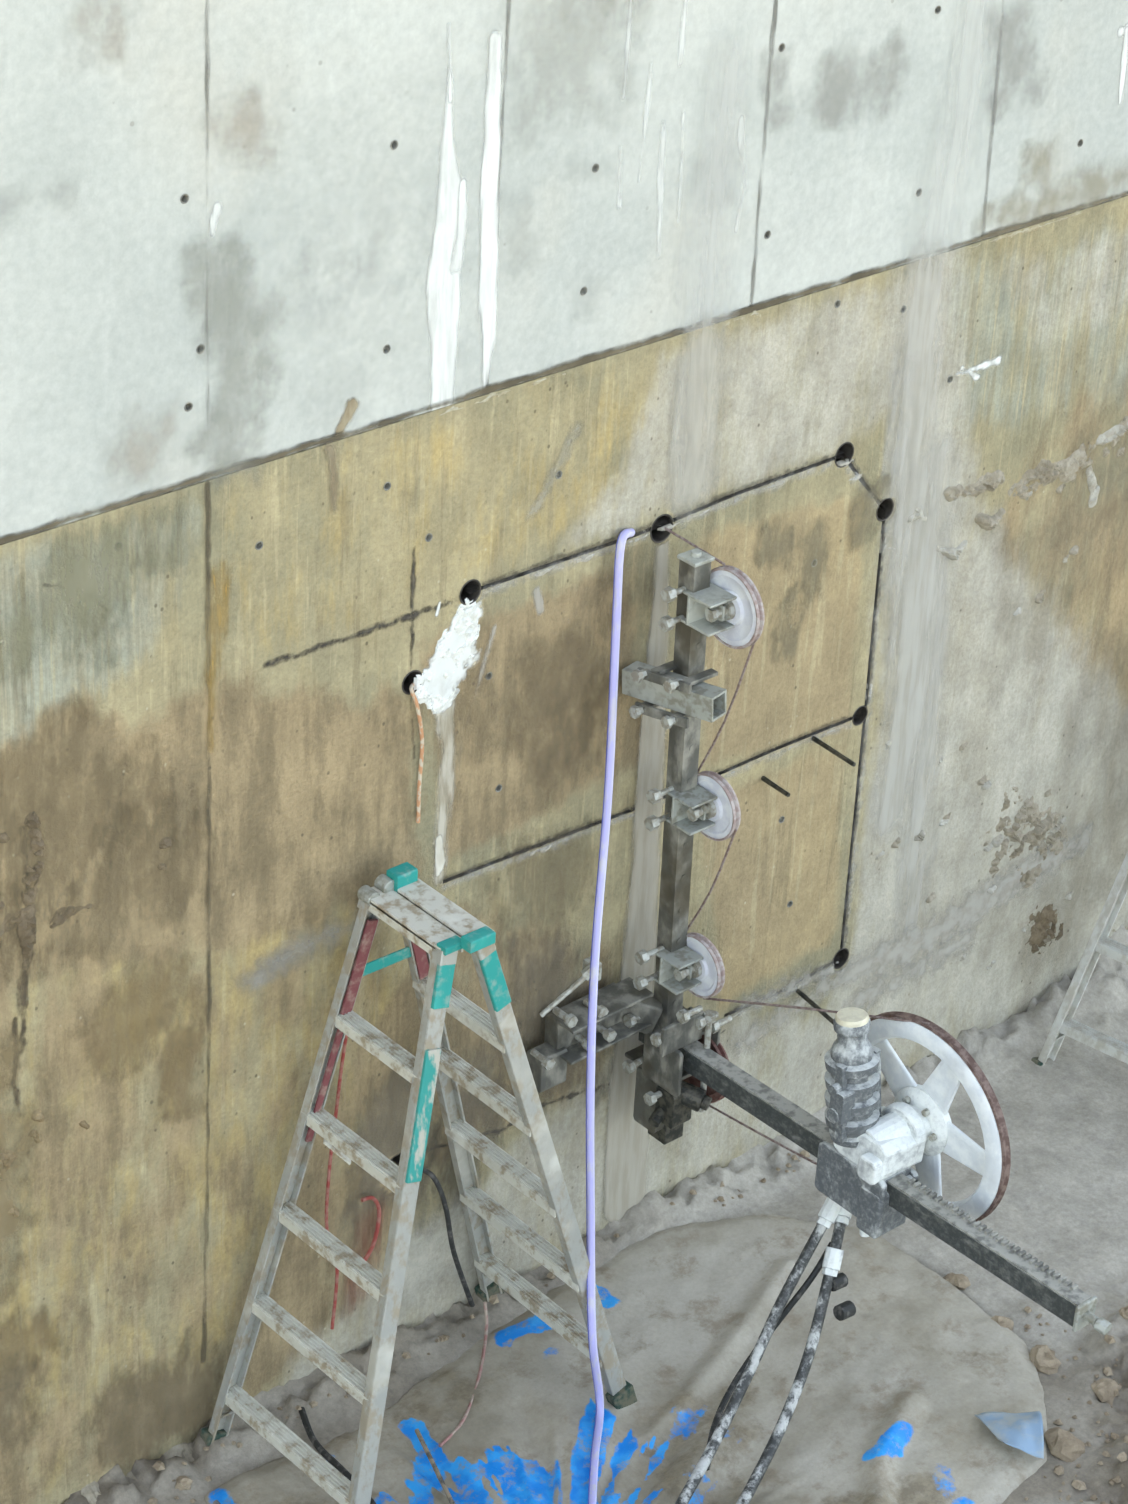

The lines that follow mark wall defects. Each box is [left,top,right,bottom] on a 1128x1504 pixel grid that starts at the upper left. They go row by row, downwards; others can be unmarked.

damp [1118,24,1128,104]
damp [427,32,501,411]
spalling [943,416,1128,531]
spalling [875,812,951,860]
spalling [974,775,1074,954]
damp [93,961,198,1115]
damp [517,949,579,1056]
damp [358,1075,411,1156]
damp [460,1089,497,1137]
damp [99,1349,220,1464]